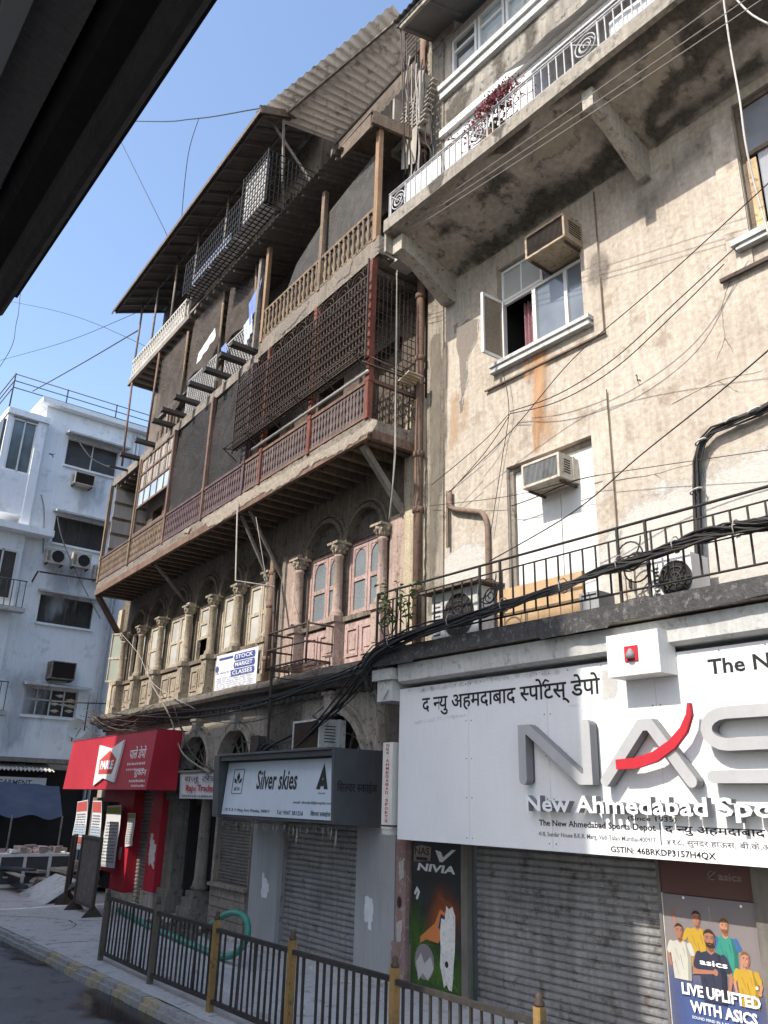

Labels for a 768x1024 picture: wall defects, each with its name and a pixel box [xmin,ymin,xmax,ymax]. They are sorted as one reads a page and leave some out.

damp [643,0,768,144]
damp [428,172,444,194]
damp [457,144,624,272]
damp [589,251,608,282]
corrosion [524,350,545,450]